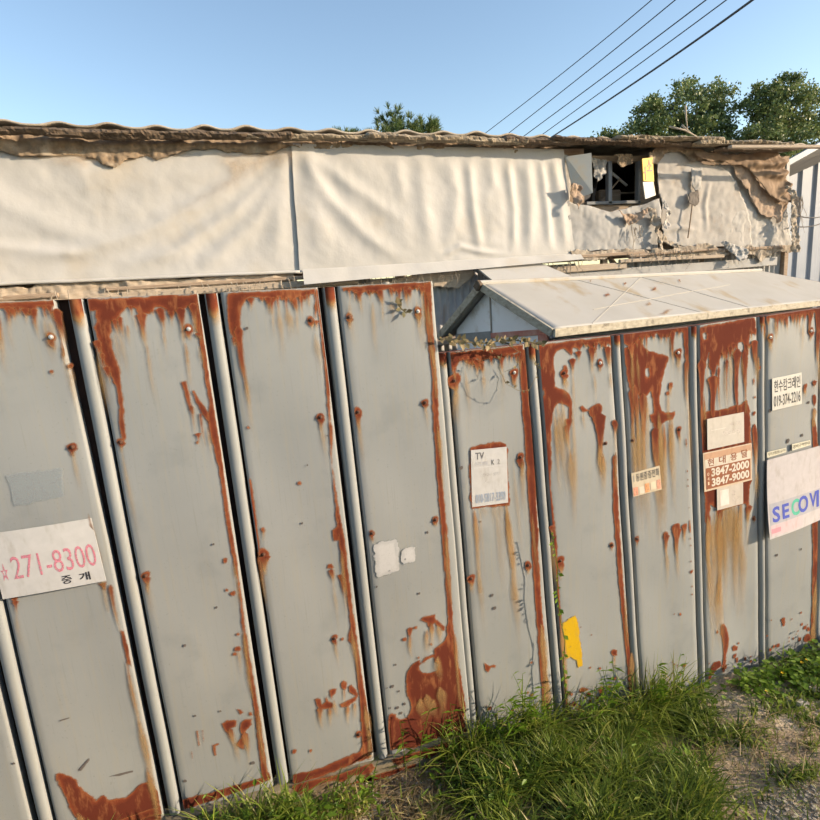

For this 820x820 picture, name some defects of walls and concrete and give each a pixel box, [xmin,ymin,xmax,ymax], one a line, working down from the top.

rust [0,282,820,820]